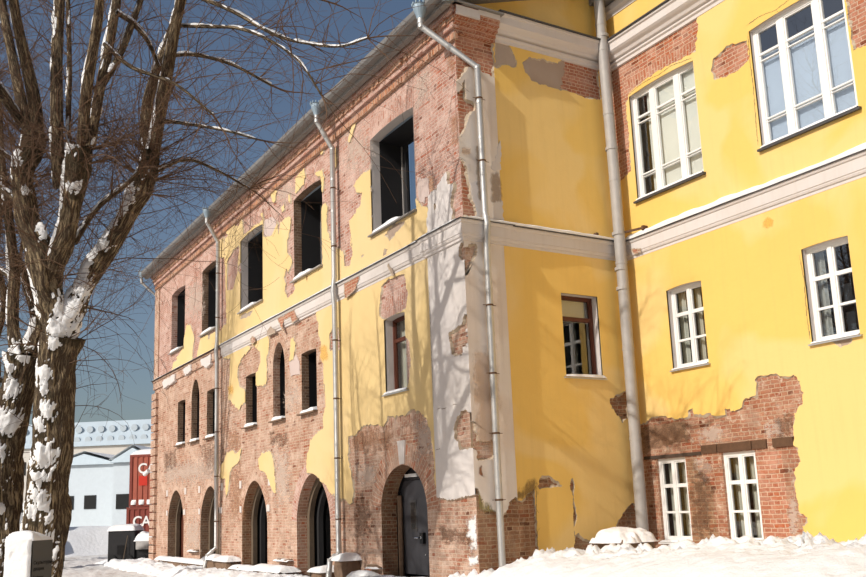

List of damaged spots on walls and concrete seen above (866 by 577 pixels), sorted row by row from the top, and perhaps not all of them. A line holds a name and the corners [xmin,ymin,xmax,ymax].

flaking render [235,35,601,298]
flaking render [610,19,698,180]
flaking render [711,40,749,80]
flaking render [846,0,866,51]
flaking render [159,233,241,376]
flaking render [152,314,340,568]
flaking render [330,409,435,575]
flaking render [454,410,494,461]
flaking render [427,475,593,577]
flaking render [610,391,628,423]
flaking render [616,503,637,528]
flaking render [640,373,808,548]